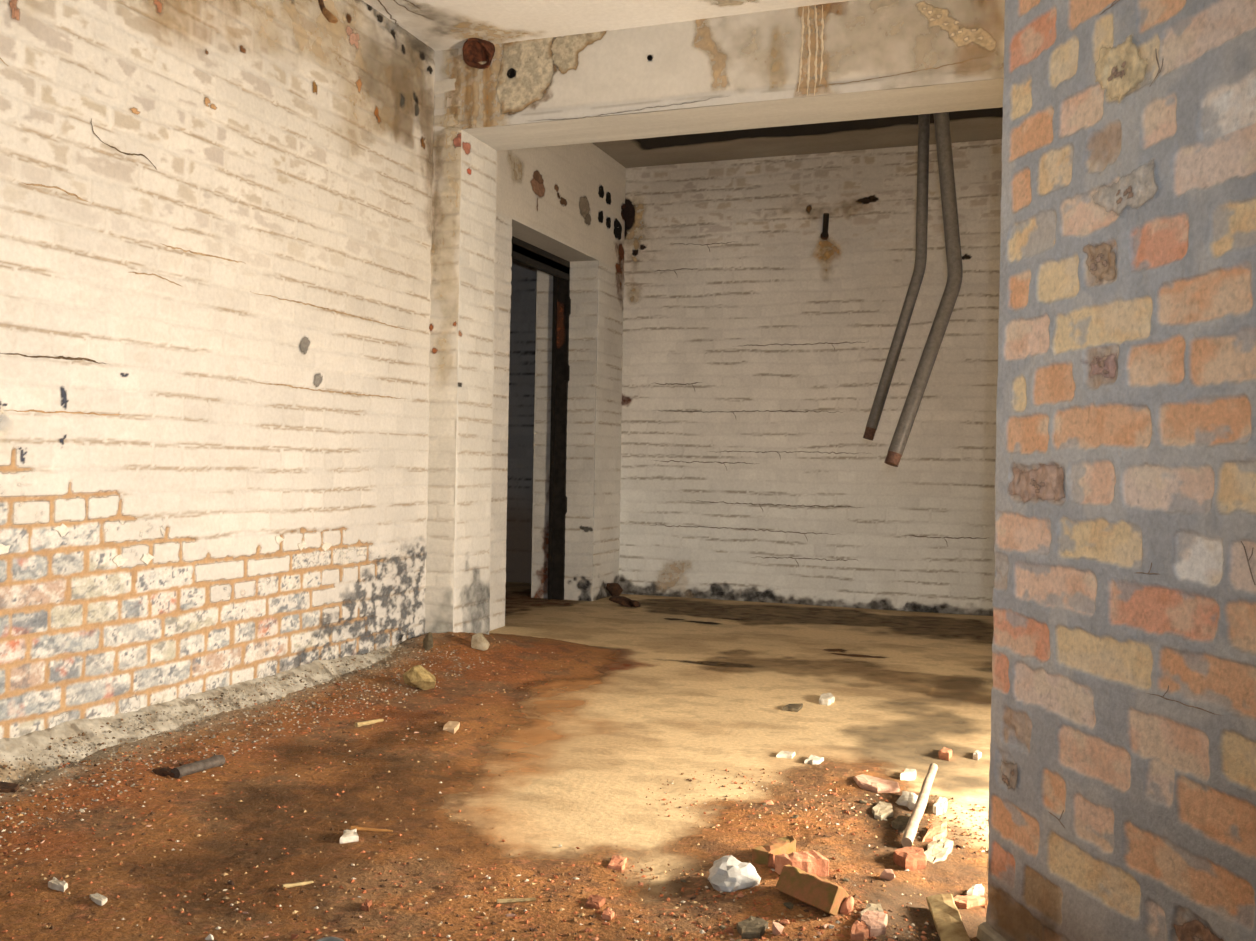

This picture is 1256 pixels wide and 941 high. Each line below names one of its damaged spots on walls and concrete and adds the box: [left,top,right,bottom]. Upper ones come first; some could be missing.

leakage [251,0,527,131]
spalling [463,31,606,115]
leakage [694,19,727,88]
leakage [797,2,849,96]
spalling [916,1,996,51]
peeling [24,183,88,202]
peeling [163,244,246,264]
peeling [250,291,411,331]
peeling [300,337,310,354]
peeling [253,373,404,399]
peeling [0,447,427,739]